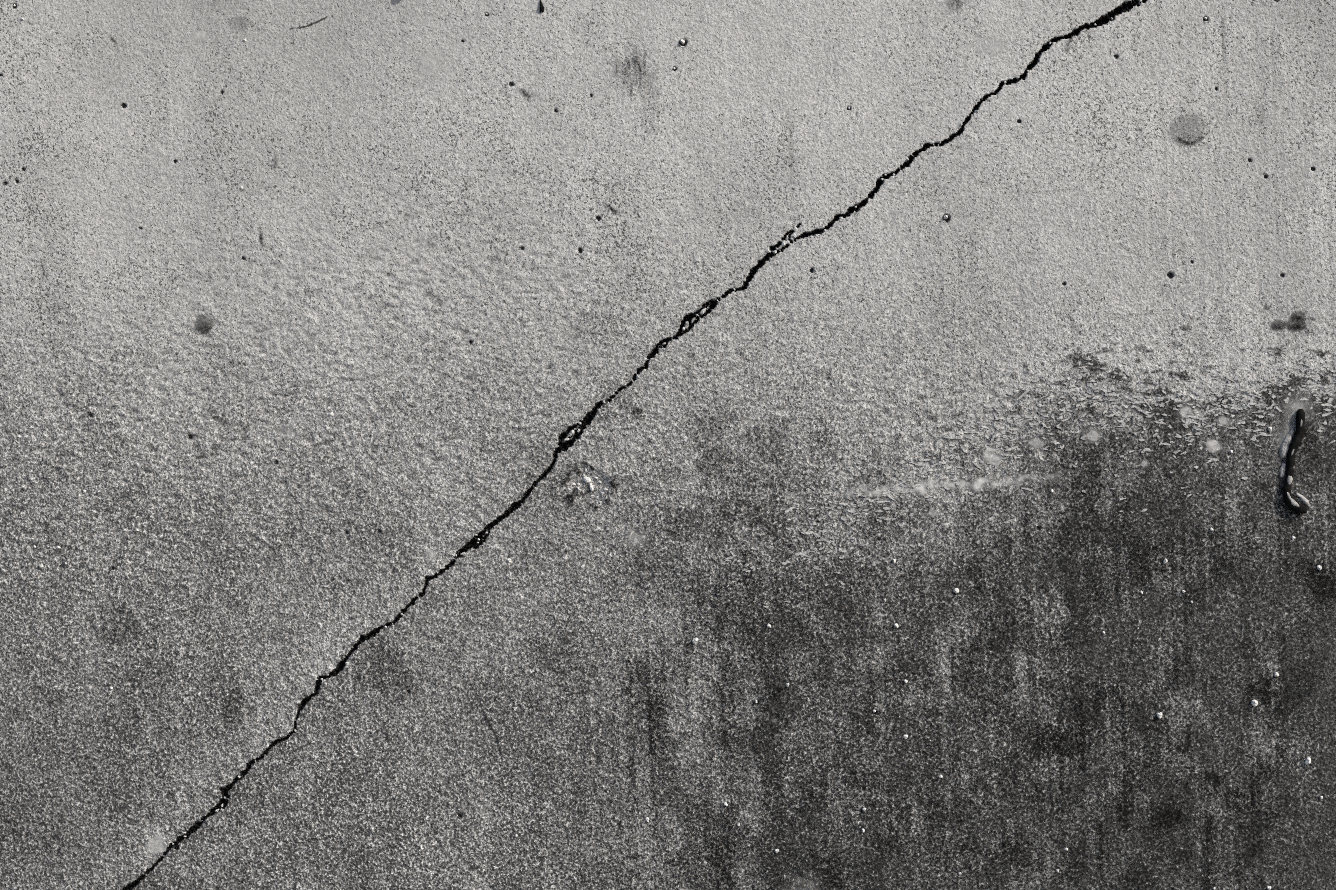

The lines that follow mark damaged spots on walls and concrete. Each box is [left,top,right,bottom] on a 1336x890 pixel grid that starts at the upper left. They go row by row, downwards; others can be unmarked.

crack [123,0,1147,890]
leakage [0,351,1336,890]